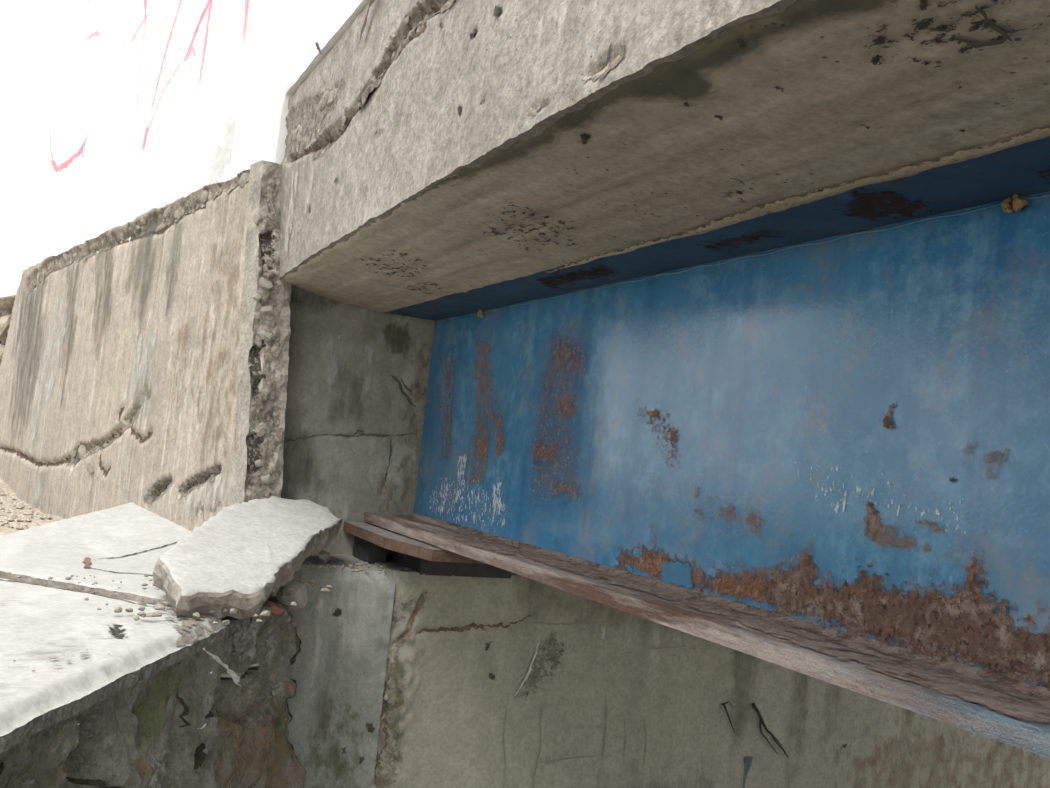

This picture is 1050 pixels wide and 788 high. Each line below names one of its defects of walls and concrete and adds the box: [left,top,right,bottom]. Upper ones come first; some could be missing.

spalling [274,82,345,163]
spalling [356,70,382,110]
crack [292,0,458,162]
spalling [26,169,250,294]
spalling [0,298,15,365]
spalling [244,177,284,502]
crack [0,390,153,477]
corrosion [465,332,504,484]
corrosion [522,318,590,517]
corrosion [863,502,931,552]
crack [417,615,646,633]
corrosion [453,525,1050,725]